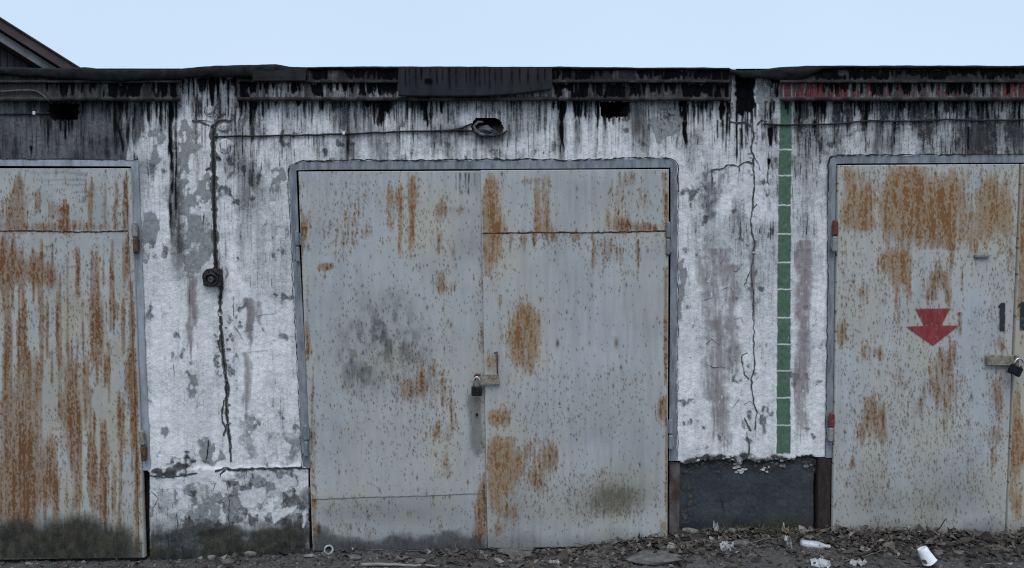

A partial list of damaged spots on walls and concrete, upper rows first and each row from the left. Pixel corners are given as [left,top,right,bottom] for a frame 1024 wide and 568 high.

corrosion [0,176,140,528]
peeling [174,119,214,280]
crack [149,106,308,534]
leakage [45,68,450,256]
leakage [705,249,739,431]
crack [705,120,769,455]
leakage [466,68,1024,165]
leakage [794,240,811,418]
corrosion [840,166,1024,325]
peeling [187,416,309,533]
corrosion [473,409,558,543]
spalling [685,453,816,474]